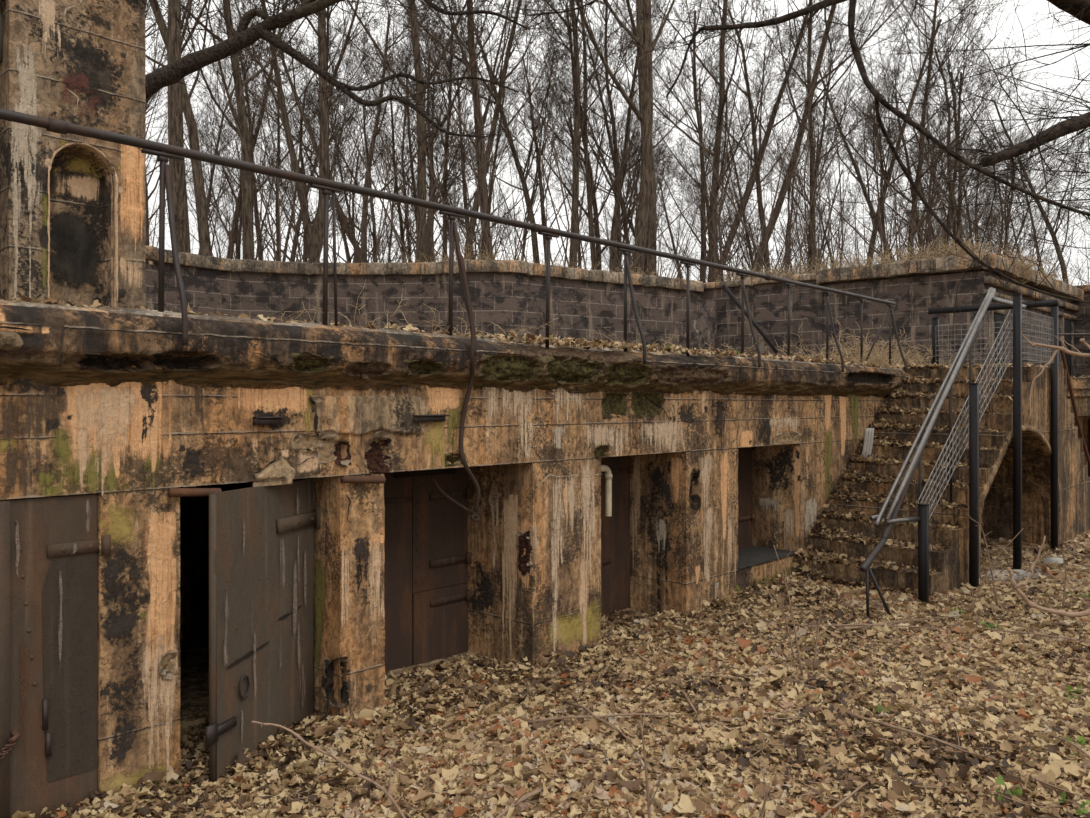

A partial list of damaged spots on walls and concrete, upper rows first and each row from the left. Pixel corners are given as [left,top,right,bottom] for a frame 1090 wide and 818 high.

damp [9,0,152,371]
damp [0,378,159,496]
spalling [313,430,393,474]
damp [341,537,385,630]
damp [471,486,519,660]
damp [483,387,538,459]
damp [551,388,583,449]
damp [551,461,595,650]
damp [584,391,736,612]
damp [749,417,818,551]
damp [100,548,178,774]